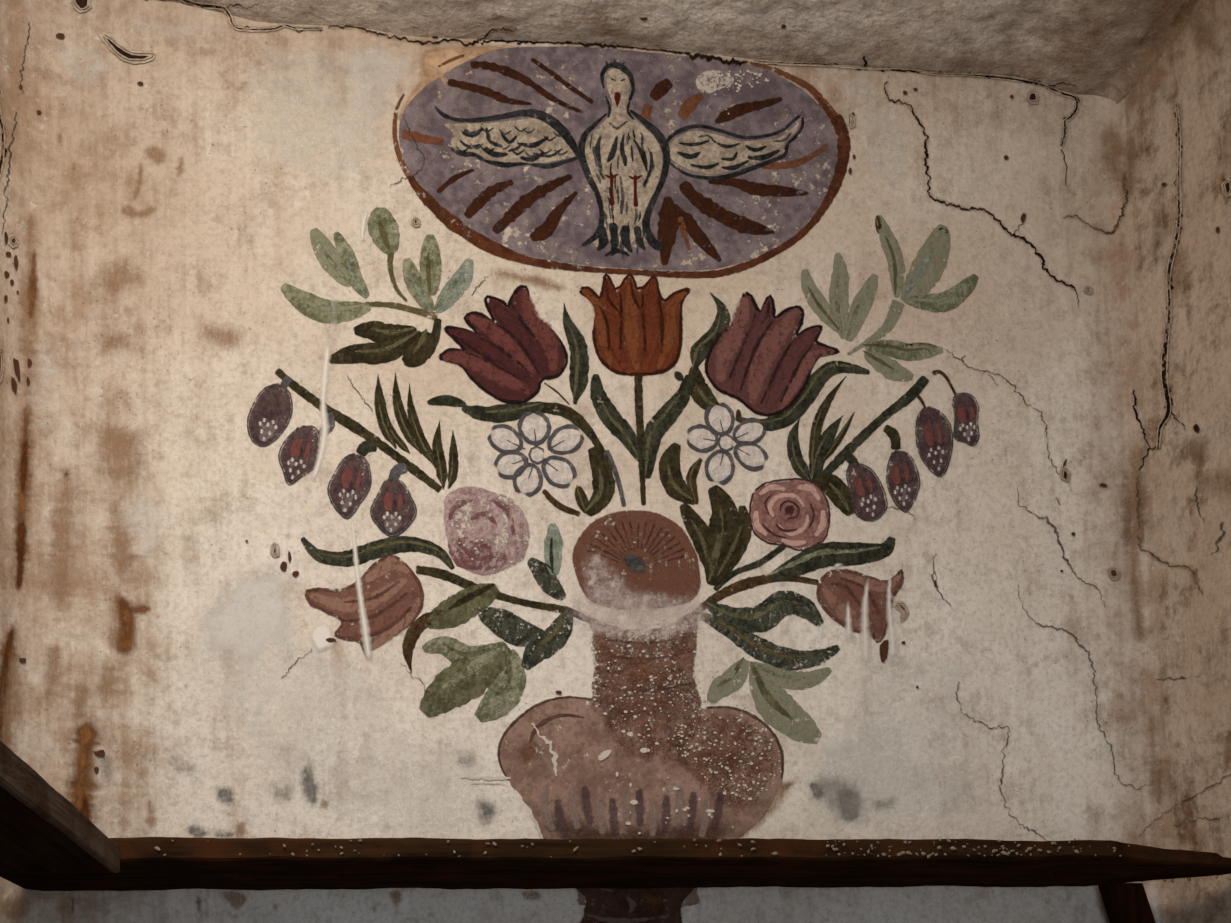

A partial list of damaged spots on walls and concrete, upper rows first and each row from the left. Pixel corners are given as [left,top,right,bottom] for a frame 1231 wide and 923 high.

crack [0,22,31,232]
crack [1064,171,1128,234]
corrosion [53,471,71,603]
corrosion [109,509,134,570]
crack [946,349,1105,606]
corrosion [0,627,19,745]
corrosion [69,685,106,819]
corrosion [108,595,149,652]
spalling [879,639,905,663]
spalling [892,601,909,622]
crack [955,682,1044,838]
crack [1018,586,1153,790]